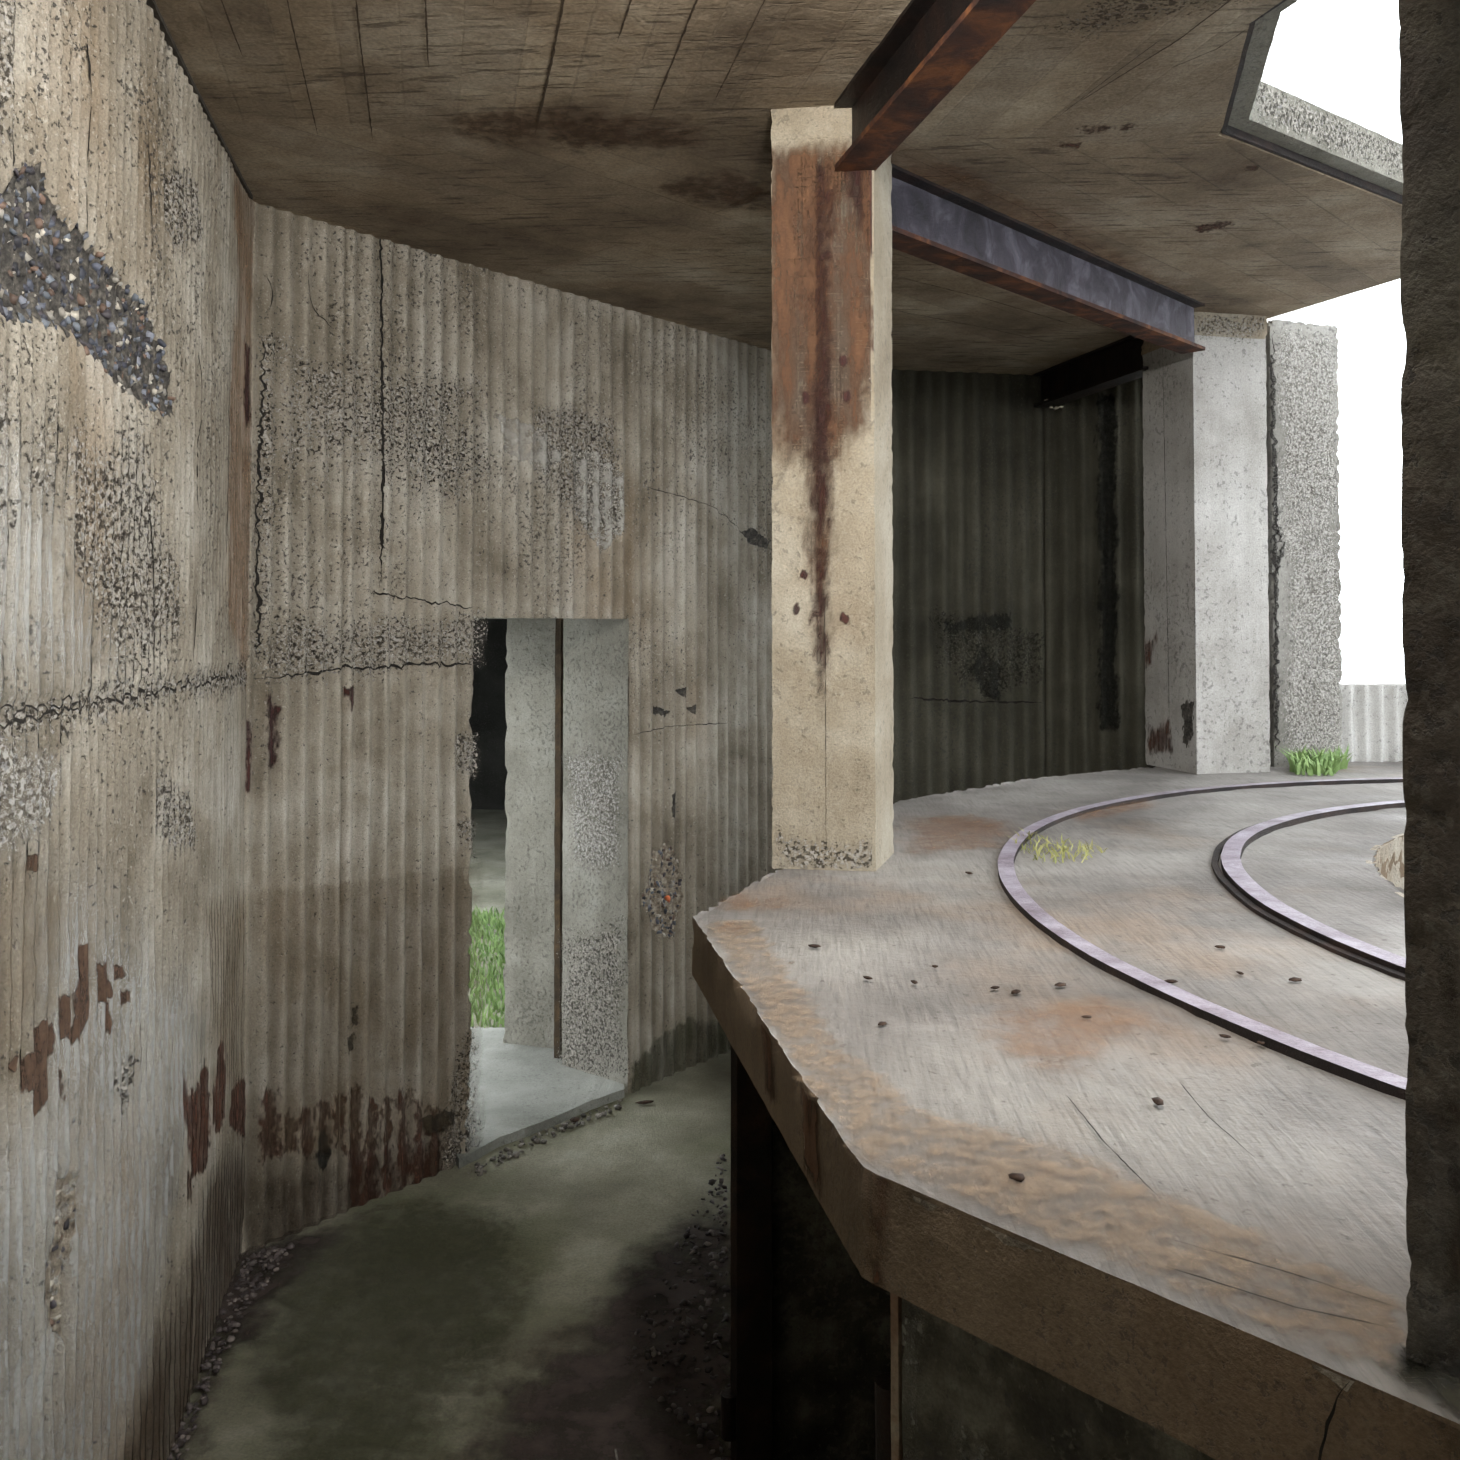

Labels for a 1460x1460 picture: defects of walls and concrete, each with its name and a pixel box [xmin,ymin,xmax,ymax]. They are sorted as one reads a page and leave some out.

rust [1061,124,1133,149]
spalling [0,162,176,417]
rust [1196,221,1235,233]
rust [661,145,874,666]
crack [87,594,95,704]
rust [8,941,130,1118]
rust [182,1041,444,1207]
crack [1318,1381,1350,1460]